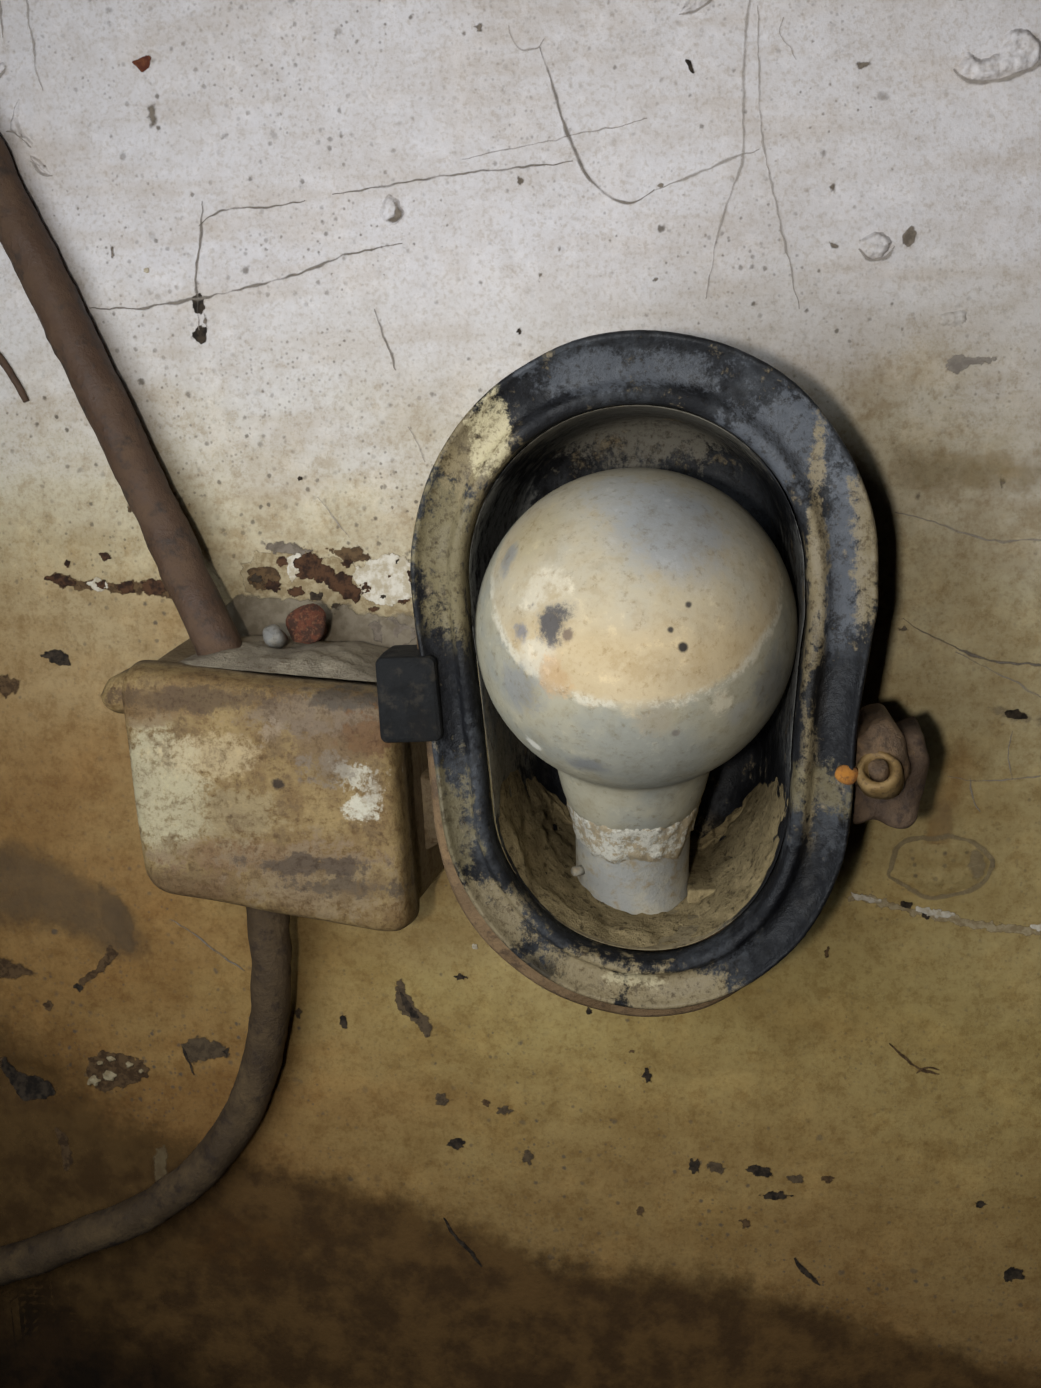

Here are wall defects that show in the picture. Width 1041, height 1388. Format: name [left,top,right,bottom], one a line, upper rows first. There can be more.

crack [91,4,799,344]
crack [374,309,396,370]
peeling [240,541,413,617]
spalling [997,708,1041,721]
spalling [0,1056,56,1101]
spalling [86,1050,150,1092]